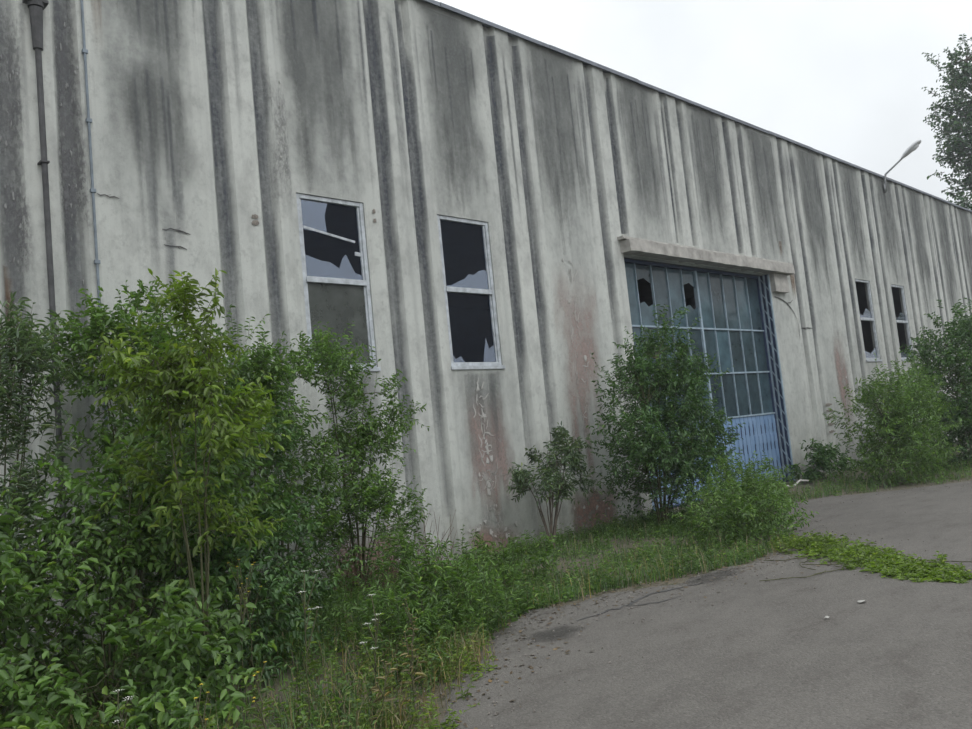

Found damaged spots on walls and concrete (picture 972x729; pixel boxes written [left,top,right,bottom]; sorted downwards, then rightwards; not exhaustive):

crack [162,228,191,250]
water stain [485,36,523,381]
water stain [512,46,547,383]
water stain [605,80,625,234]
water stain [645,106,692,226]
water stain [696,115,750,244]
water stain [751,131,859,346]
water stain [857,175,972,330]